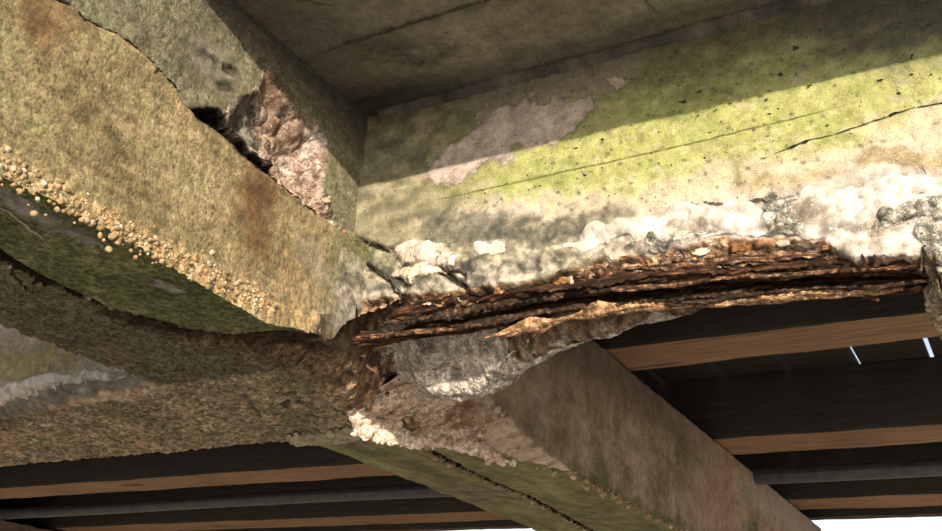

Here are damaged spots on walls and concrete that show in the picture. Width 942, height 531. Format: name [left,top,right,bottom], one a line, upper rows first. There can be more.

crack [56,0,179,92]
peeling [190,39,239,92]
spalling [224,68,351,233]
peeling [423,91,595,186]
crack [761,102,942,159]
water stain [424,146,942,259]
rust [106,251,928,352]
spalling [912,247,936,276]
spalling [282,236,904,531]
crack [415,448,594,531]